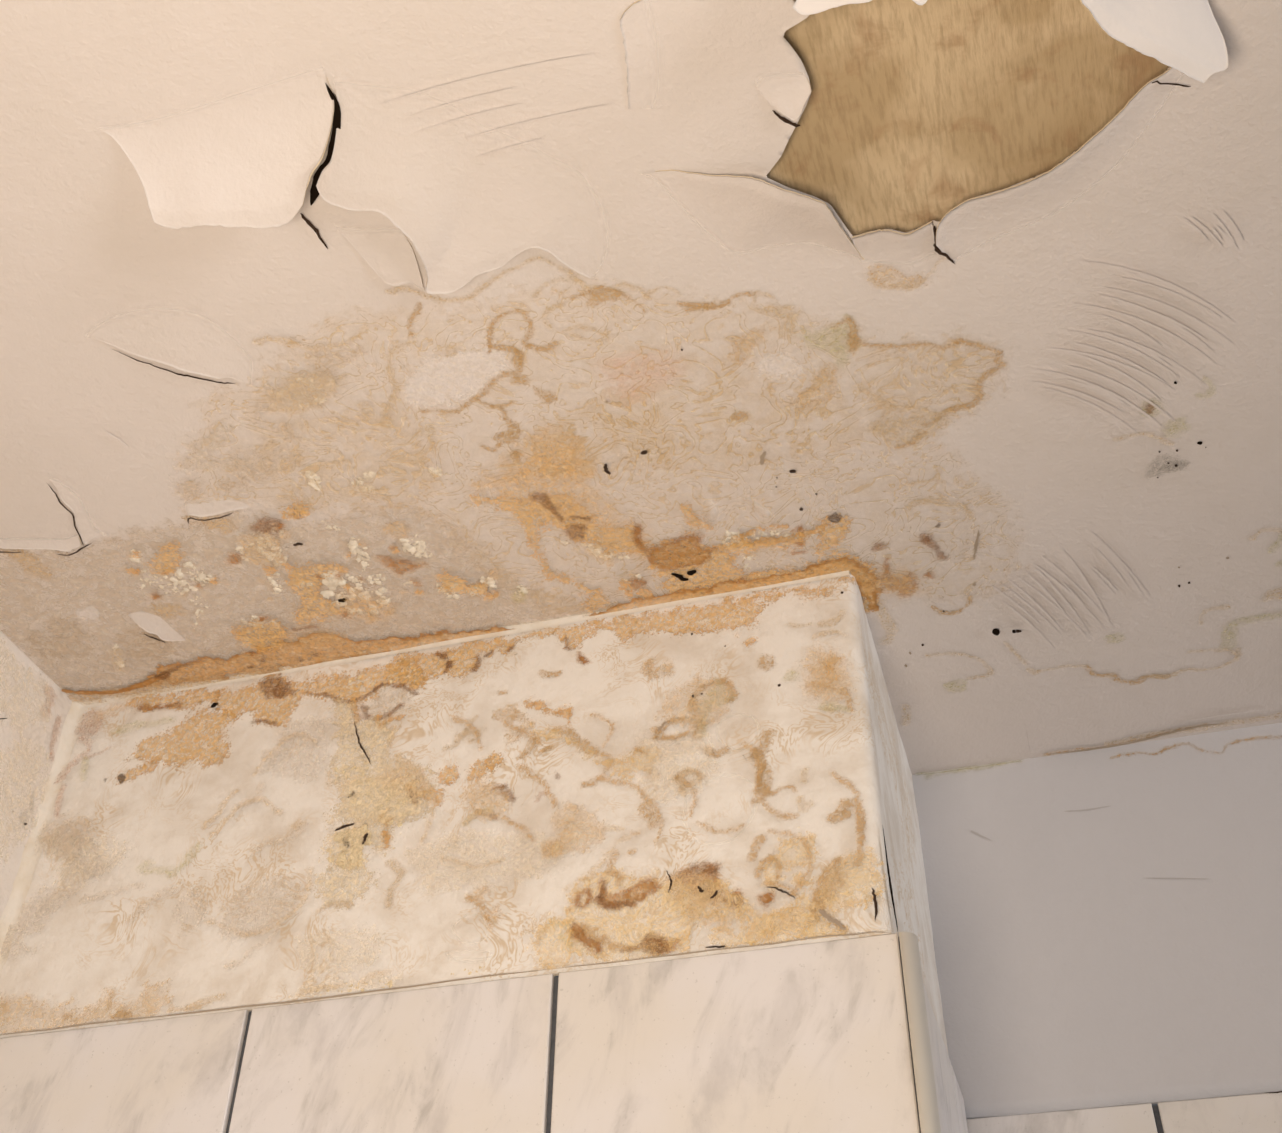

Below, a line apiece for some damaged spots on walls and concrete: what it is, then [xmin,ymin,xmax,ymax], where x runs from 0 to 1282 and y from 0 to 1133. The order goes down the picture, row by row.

crack [300,83,341,249]
peeling [101,71,606,294]
peeling [89,312,250,384]
damp [408,309,594,474]
peeling [0,479,102,556]
peeling [185,498,254,524]
damp [0,504,574,724]
damp [561,539,653,601]
damp [699,508,814,582]
damp [322,761,422,871]
damp [408,679,744,883]
damp [744,730,883,941]